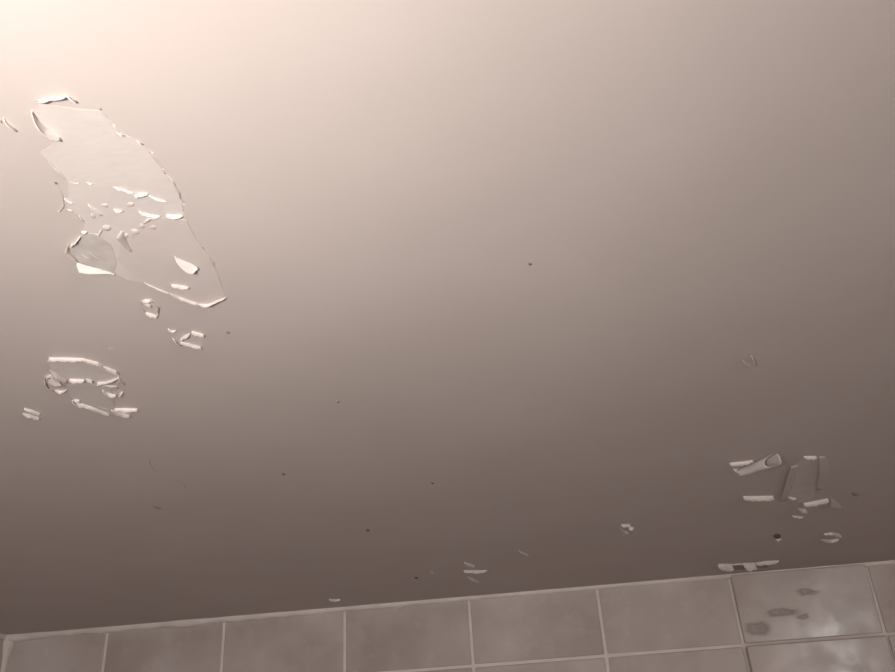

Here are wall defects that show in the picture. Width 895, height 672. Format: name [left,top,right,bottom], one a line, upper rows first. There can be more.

peeling [31,95,226,308]
peeling [168,329,204,349]
peeling [43,358,137,418]
peeling [729,453,841,519]
peeling [821,532,842,543]